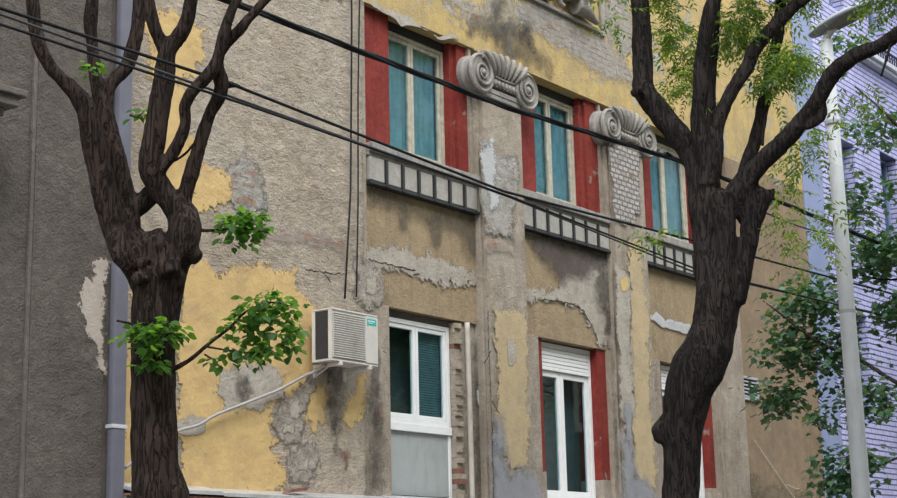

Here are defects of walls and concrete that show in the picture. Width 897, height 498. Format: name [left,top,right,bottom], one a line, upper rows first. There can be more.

flaking render [362,0,633,84]
spalling [479,142,520,255]
flaking render [77,257,111,375]
spalling [352,240,477,313]
peeling [491,138,660,490]
peeling [175,259,331,497]
peeling [340,373,369,432]